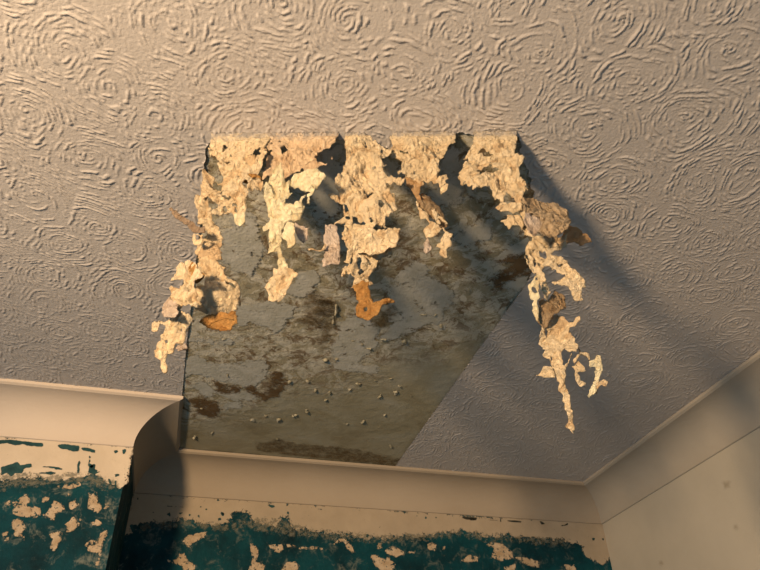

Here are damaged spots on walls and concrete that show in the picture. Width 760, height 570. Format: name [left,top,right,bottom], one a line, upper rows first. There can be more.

damp [488,253,535,291]
flaking render [151,129,608,466]
damp [296,294,338,348]
damp [212,371,288,401]
damp [187,398,220,418]
damp [258,440,398,465]
peeling [2,482,81,551]
peeling [85,492,109,566]
peeling [168,531,207,570]
peeling [249,543,265,570]
peeling [370,543,414,570]
peeling [488,543,539,570]